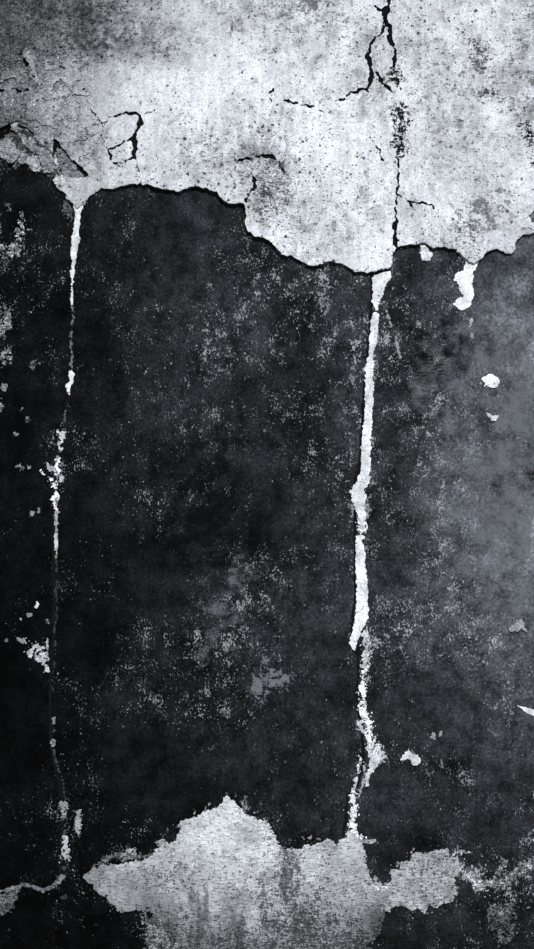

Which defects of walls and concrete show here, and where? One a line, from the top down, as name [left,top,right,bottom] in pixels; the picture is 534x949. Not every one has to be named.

crack [269,0,397,112]
crack [91,110,155,186]
flaking render [0,122,534,274]
crack [368,130,435,250]
flaking render [0,303,16,368]
damp [349,271,392,542]
peeling [481,374,500,388]
flaking render [5,636,50,673]
damp [347,627,388,840]
peeling [400,749,421,766]
flaking render [0,874,67,916]
spalling [83,793,534,949]